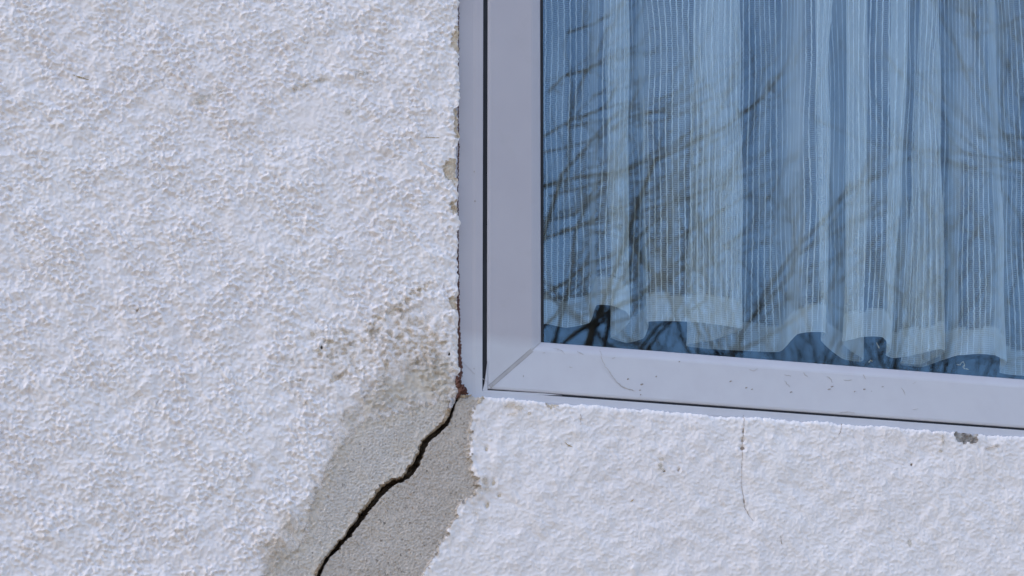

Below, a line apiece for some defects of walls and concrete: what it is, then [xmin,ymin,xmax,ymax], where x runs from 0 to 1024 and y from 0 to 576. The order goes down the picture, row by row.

peeling [265,396,501,576]
crack [313,393,460,576]
flaking render [954,431,978,444]